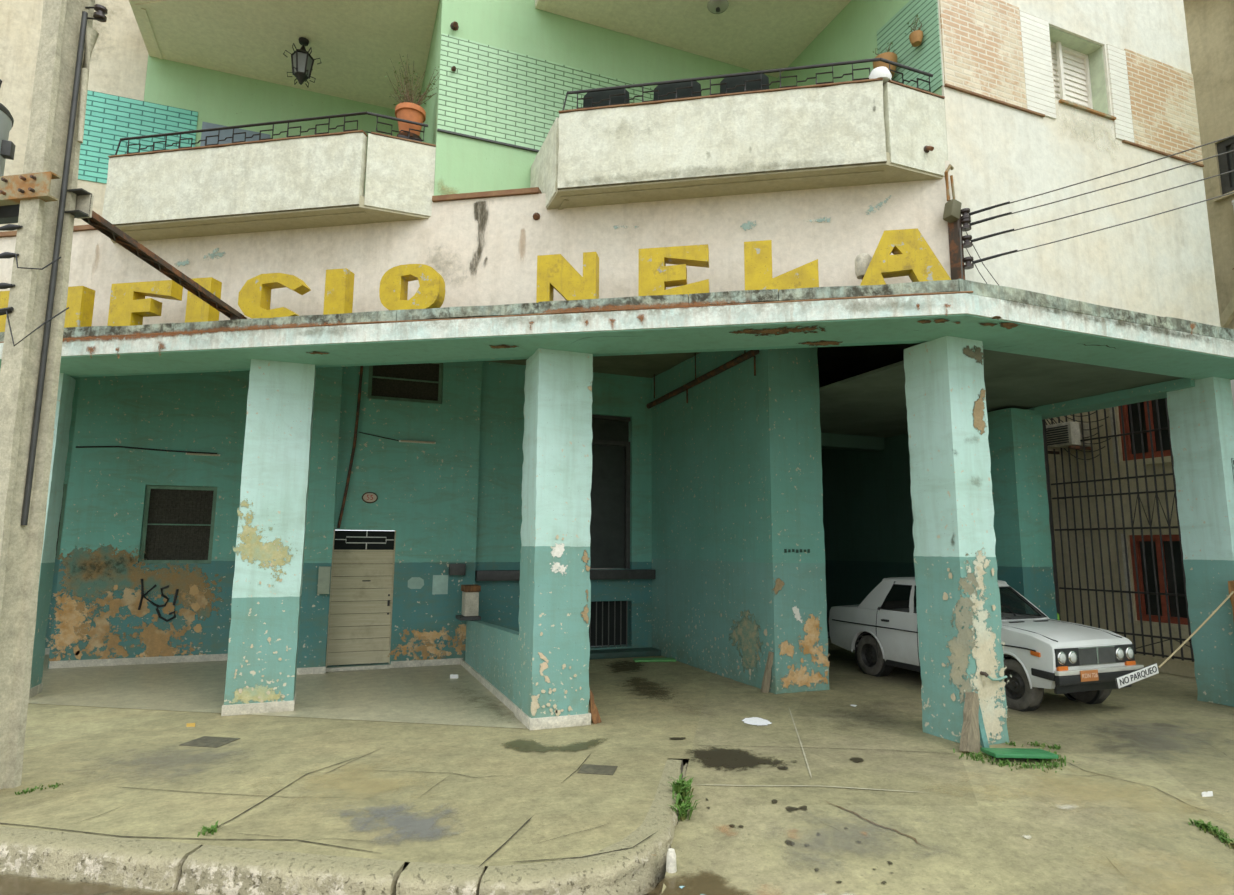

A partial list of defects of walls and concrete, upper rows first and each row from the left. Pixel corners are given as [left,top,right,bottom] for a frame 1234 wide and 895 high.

leakage [470,201,488,272]
spalling [972,388,988,435]
peeling [233,498,298,587]
peeling [550,535,569,575]
peeling [47,544,226,661]
spalling [580,590,589,623]
peeling [229,642,285,704]
peeling [388,622,466,665]
peeling [530,652,581,716]
peeling [764,606,830,690]
peeling [942,548,1012,743]